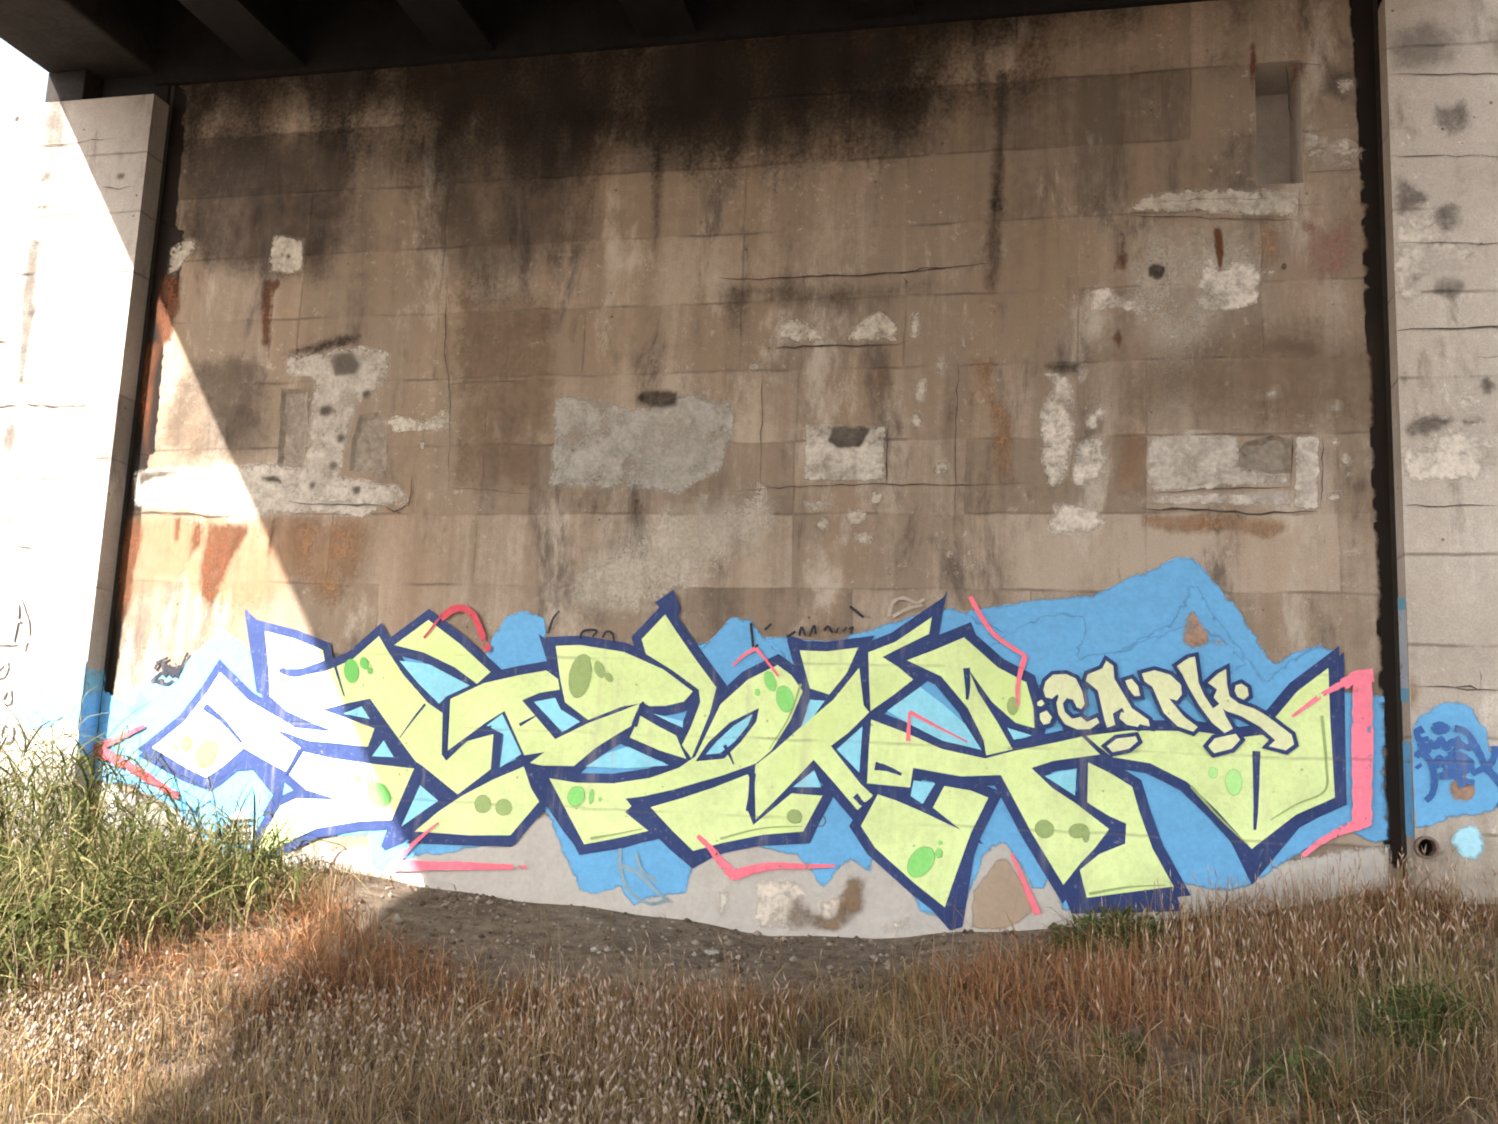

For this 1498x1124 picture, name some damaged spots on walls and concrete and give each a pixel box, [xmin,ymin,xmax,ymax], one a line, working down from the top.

water stain [124,12,1067,529]
rust [1214,228,1224,267]
rust [140,276,180,438]
rust [261,281,279,344]
peeling [778,320,822,341]
peeling [849,312,920,341]
spalling [277,387,308,470]
spalling [1237,435,1292,474]
peeling [1154,493,1291,506]
water stain [106,564,135,696]